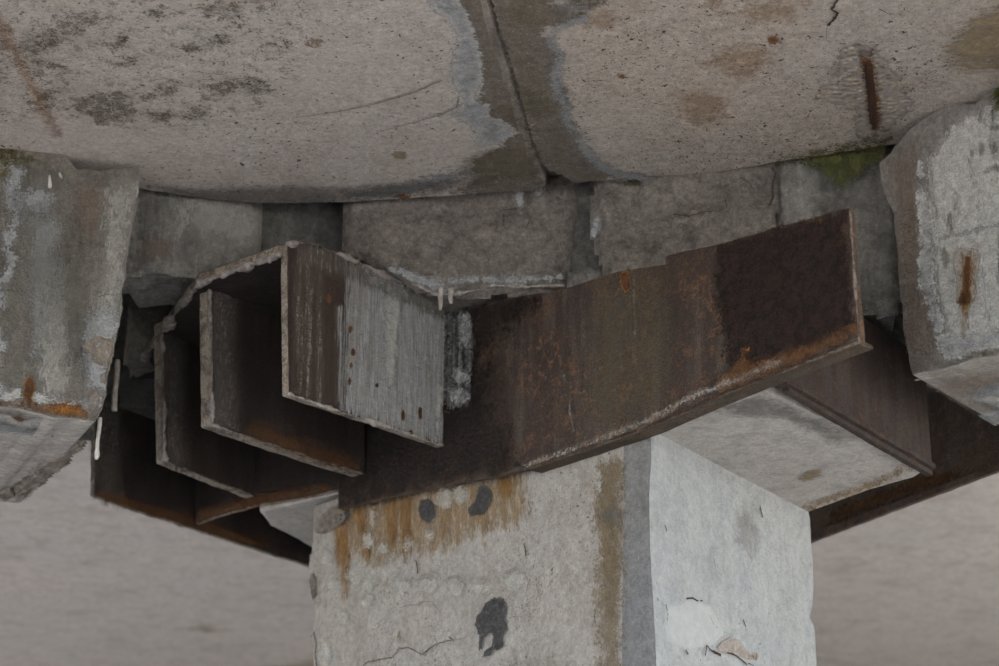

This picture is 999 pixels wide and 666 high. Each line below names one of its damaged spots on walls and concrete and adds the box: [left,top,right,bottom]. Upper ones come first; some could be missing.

crack [826,0,839,48]
water stain [344,0,656,209]
corrosion [0,376,90,423]
water stain [0,163,139,506]
water stain [144,198,260,257]
water stain [208,289,241,436]
water stain [897,100,999,425]
corrosion [953,247,980,337]
corrosion [334,474,531,598]
crack [364,631,474,665]
peeling [663,597,758,666]